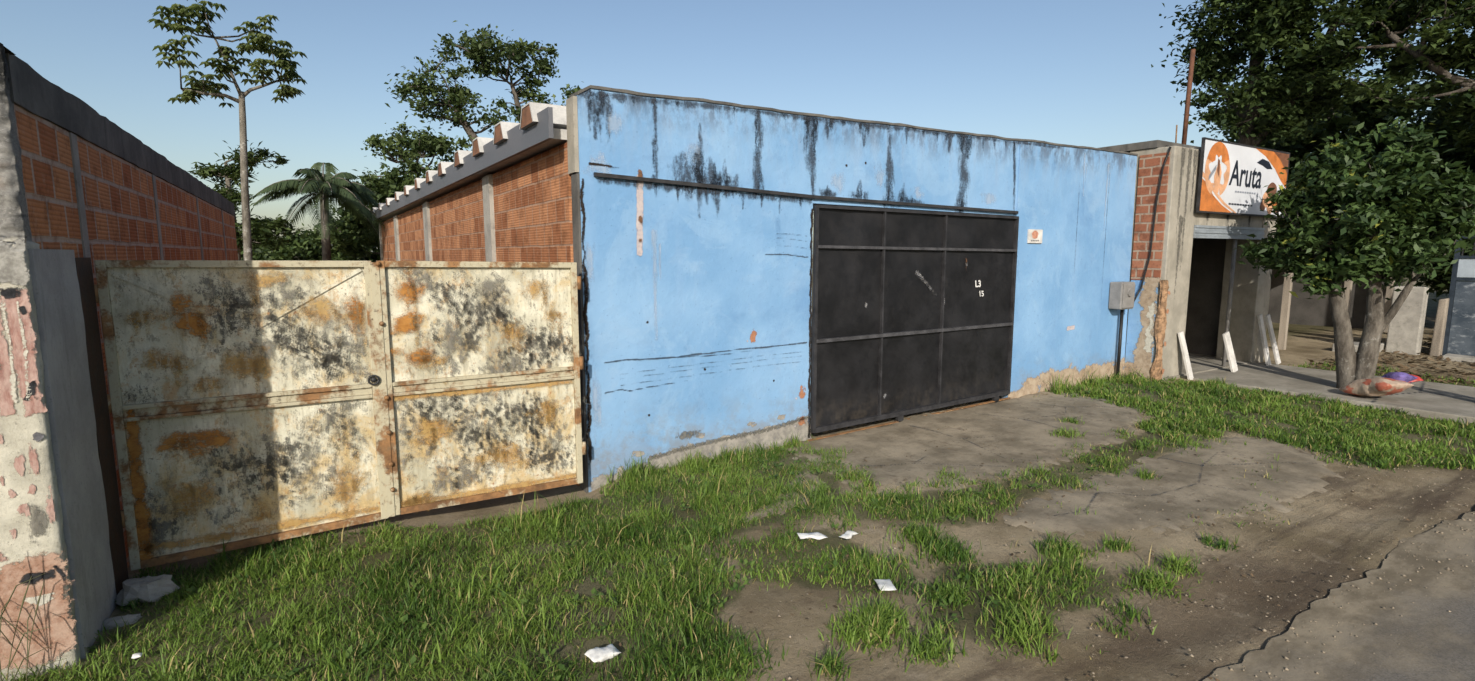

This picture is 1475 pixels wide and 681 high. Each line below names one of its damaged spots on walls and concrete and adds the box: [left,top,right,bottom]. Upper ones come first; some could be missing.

water stain [580,90,1060,213]
peeling [0,238,47,417]
peeling [0,443,55,539]
peeling [0,551,77,669]